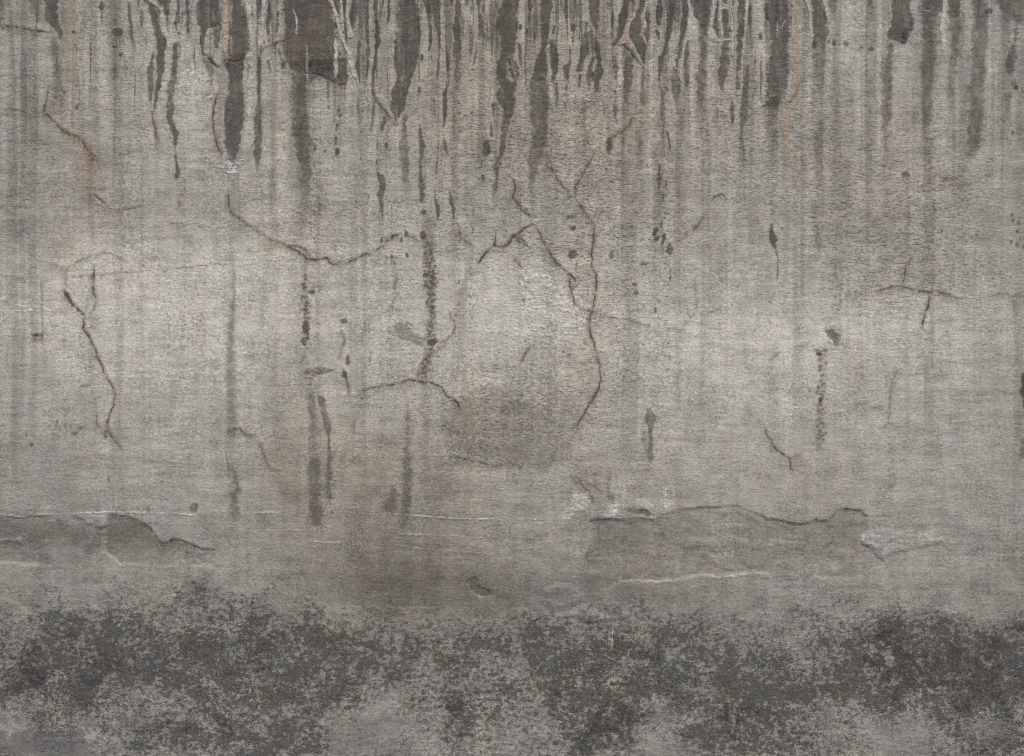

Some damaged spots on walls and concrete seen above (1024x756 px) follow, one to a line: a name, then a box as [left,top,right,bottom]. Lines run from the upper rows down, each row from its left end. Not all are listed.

leakage [45,0,76,38]
leakage [112,0,482,179]
leakage [481,0,874,184]
leakage [887,0,1021,147]
crack [227,196,426,265]
leakage [376,160,386,217]
leakage [405,125,455,220]
crack [458,117,639,429]
crack [879,257,959,327]
crack [32,253,225,443]
crack [340,316,461,411]
peeling [862,531,940,557]